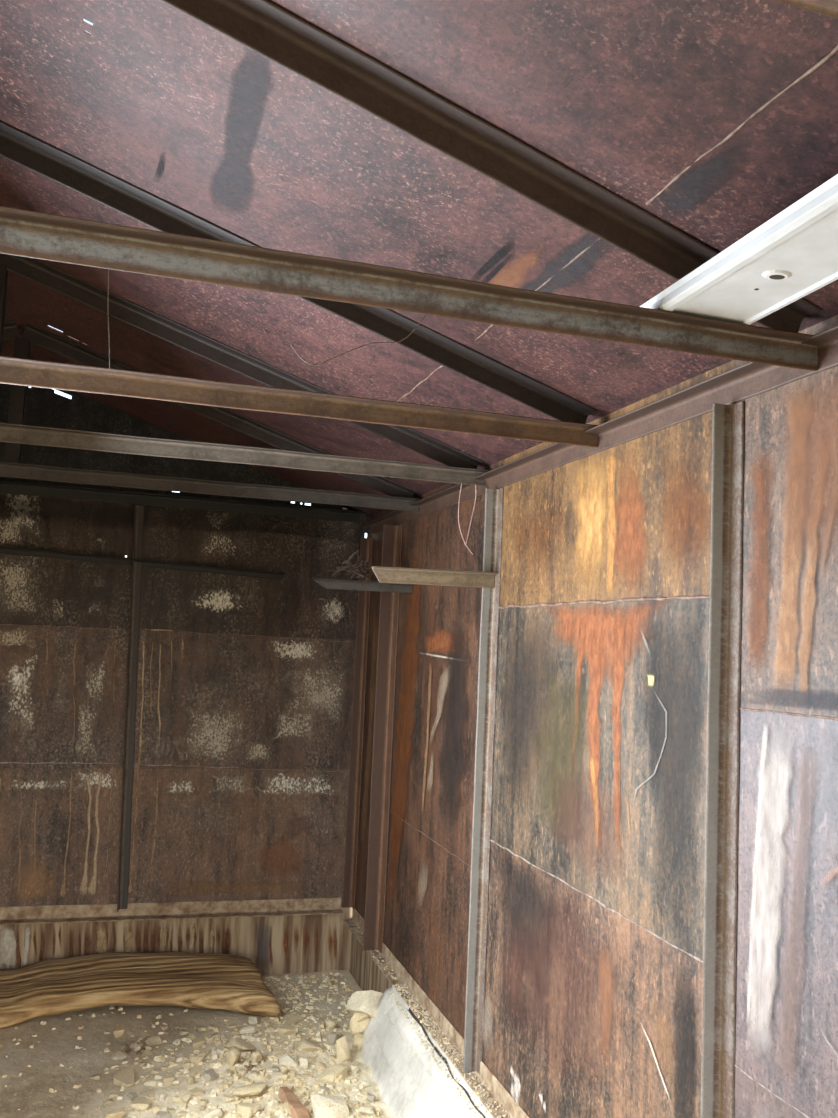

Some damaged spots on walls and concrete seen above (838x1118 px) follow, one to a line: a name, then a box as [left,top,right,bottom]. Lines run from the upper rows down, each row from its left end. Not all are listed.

damp [212,58,269,208]
damp [0,499,294,534]
rust [576,459,644,585]
rust [558,608,648,849]